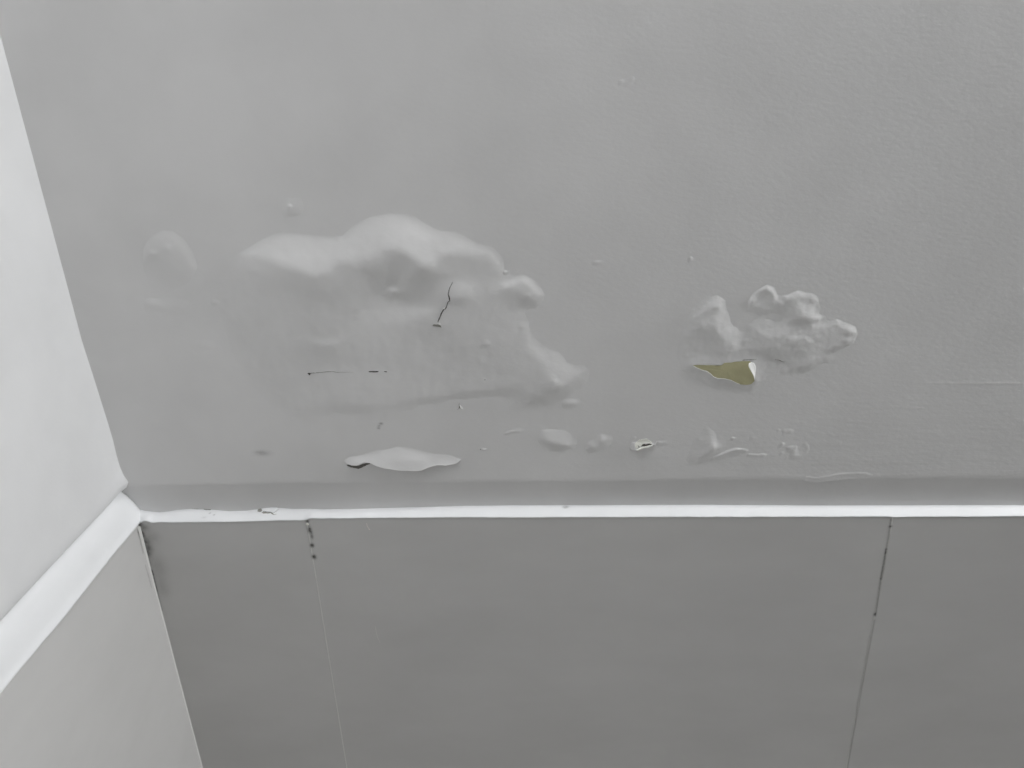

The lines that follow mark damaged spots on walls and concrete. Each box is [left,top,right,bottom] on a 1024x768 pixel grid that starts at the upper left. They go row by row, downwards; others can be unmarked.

crack [433,282,453,328]
peeling [693,359,756,385]
peeling [628,435,672,451]